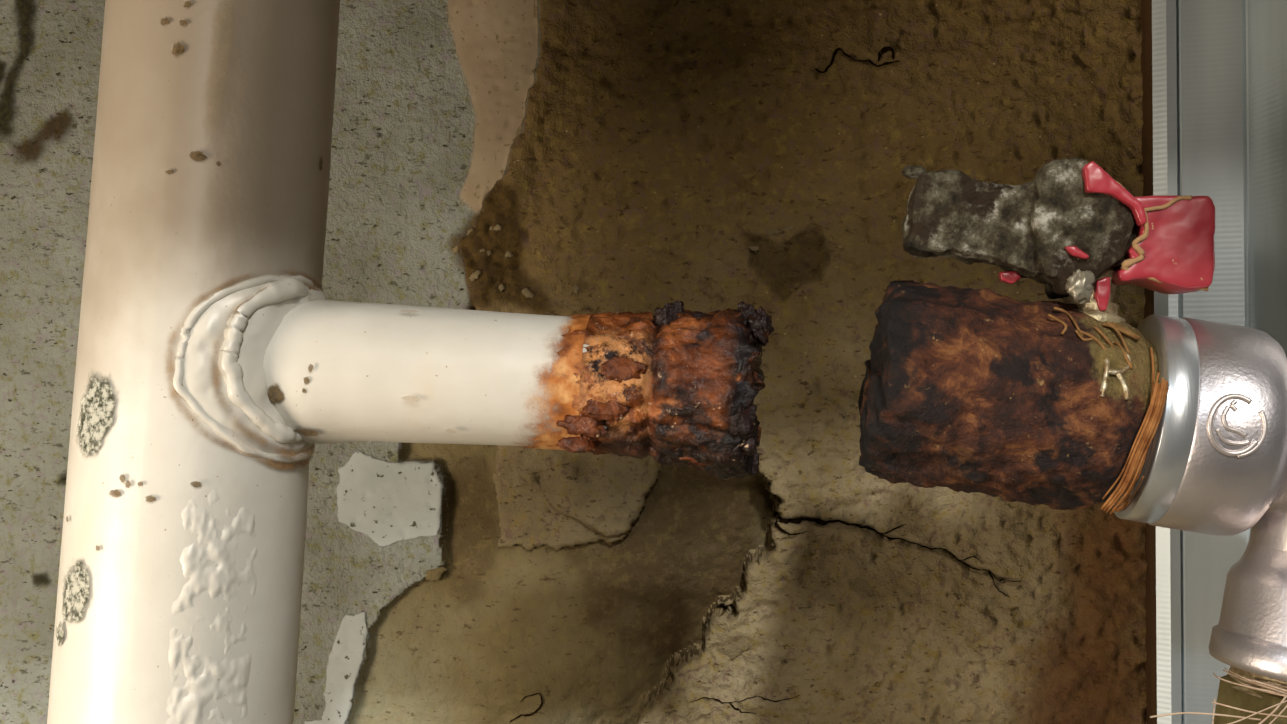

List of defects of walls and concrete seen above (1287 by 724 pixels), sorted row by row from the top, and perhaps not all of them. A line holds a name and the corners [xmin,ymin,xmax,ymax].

leakage [0,0,72,161]
peeling [448,0,550,312]
spalling [304,442,779,724]
crack [774,511,1017,597]
crack [510,693,543,722]
crack [689,695,800,714]